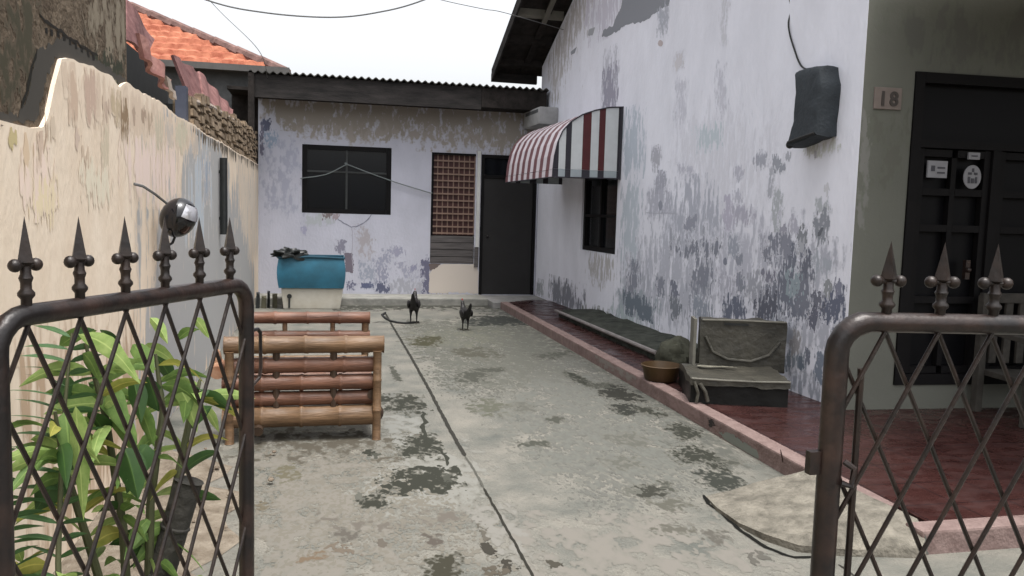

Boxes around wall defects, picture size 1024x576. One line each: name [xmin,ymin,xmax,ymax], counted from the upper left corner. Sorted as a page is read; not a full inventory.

peeling [588,0,670,37]
flaking render [344,253,354,273]
flaking render [595,355,644,385]
water stain [254,223,806,576]
water stain [213,432,239,487]
water stain [192,557,230,576]